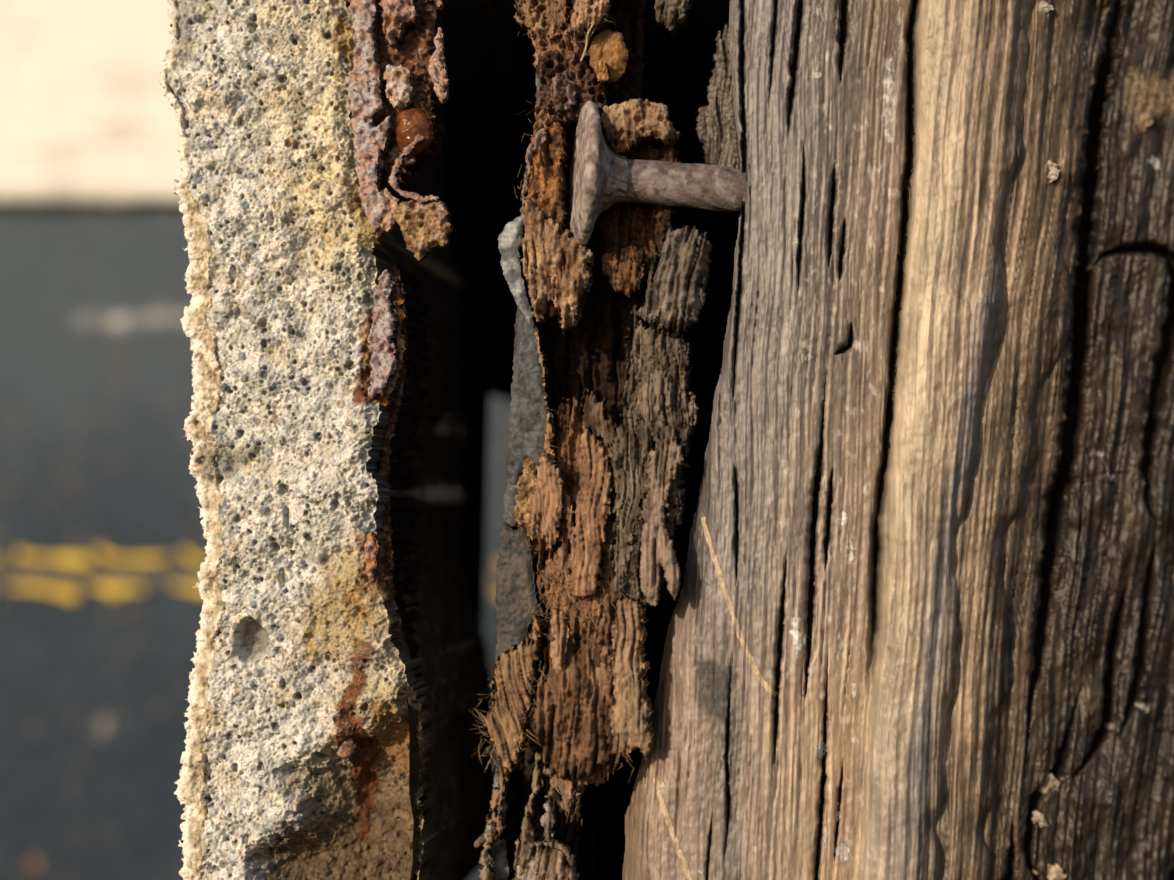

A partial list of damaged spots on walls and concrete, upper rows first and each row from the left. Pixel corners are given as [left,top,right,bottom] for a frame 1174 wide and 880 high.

corrosion [383,64,415,109]
corrosion [428,27,450,104]
peeling [515,0,611,233]
corrosion [350,179,454,261]
peeling [598,202,680,298]
corrosion [353,269,408,407]
crack [872,0,917,649]
crack [1004,0,1174,880]
peeling [529,332,687,841]
crack [732,467,740,582]
crack [774,322,853,880]
peeling [478,758,511,880]